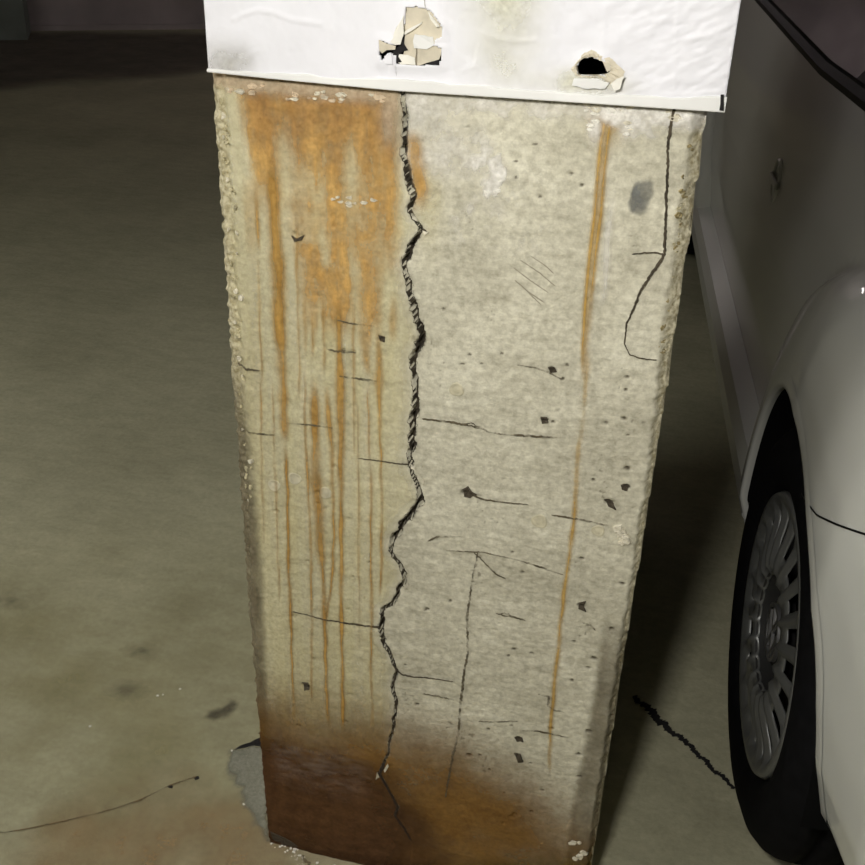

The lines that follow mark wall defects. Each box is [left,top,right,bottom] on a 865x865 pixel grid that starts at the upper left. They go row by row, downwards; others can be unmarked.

peeling [379,7,442,66]
corrosion [582,119,611,350]
crack [624,109,676,361]
corrosion [241,90,593,865]
crack [294,91,564,841]
crack [0,796,147,833]
crack [632,695,735,789]